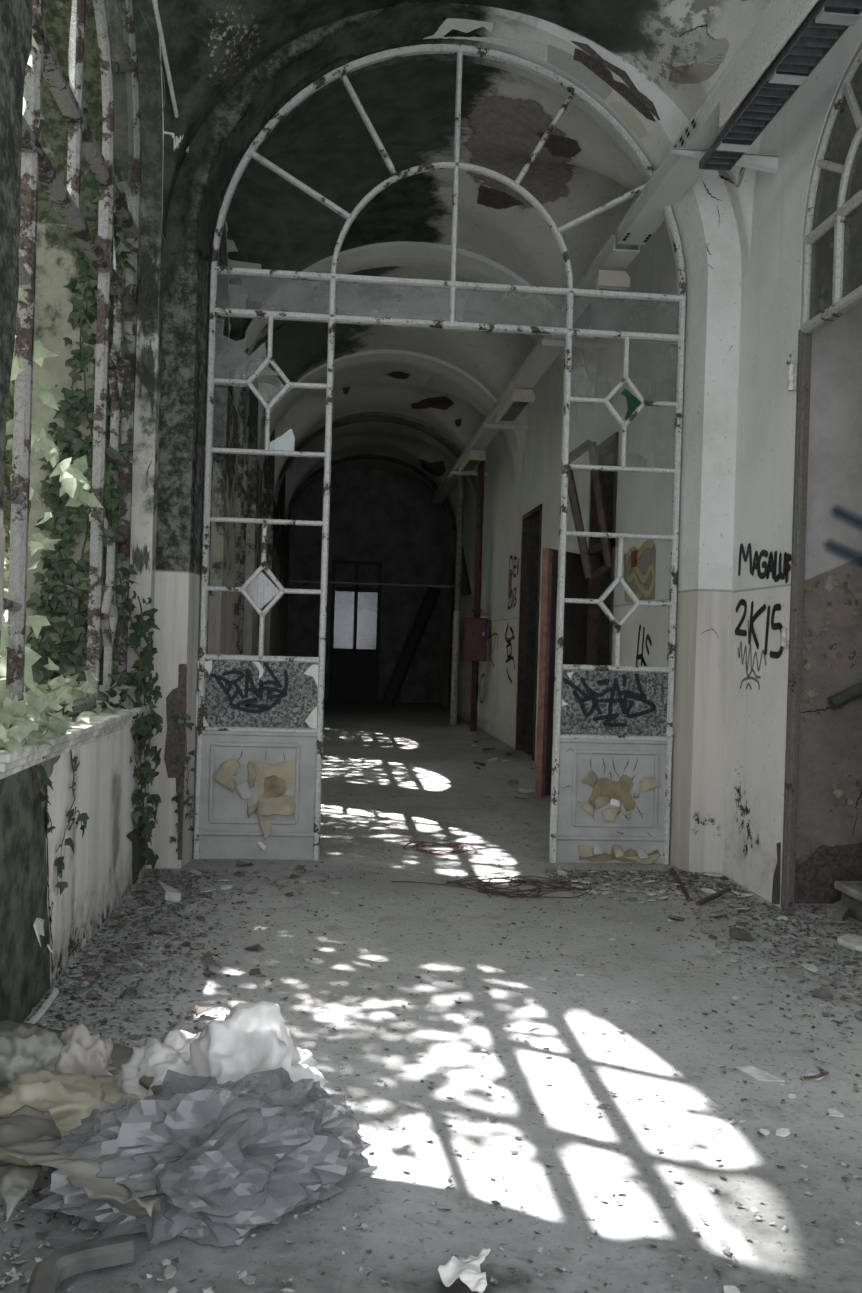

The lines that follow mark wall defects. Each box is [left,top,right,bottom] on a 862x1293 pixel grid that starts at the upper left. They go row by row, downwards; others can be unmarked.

peeling [423,18,660,122]
peeling [669,26,729,84]
peeling [463,93,581,209]
damp [138,0,660,425]
spalling [410,396,461,427]
peeling [213,751,296,850]
peeling [577,758,661,822]